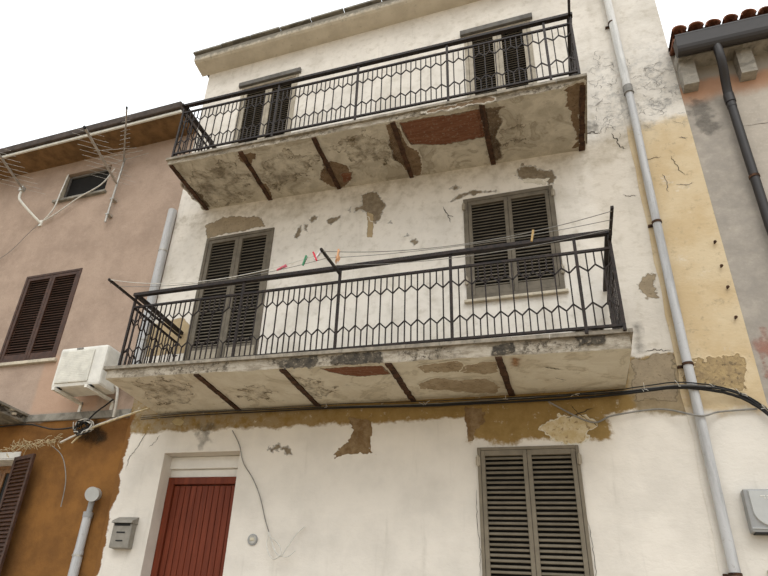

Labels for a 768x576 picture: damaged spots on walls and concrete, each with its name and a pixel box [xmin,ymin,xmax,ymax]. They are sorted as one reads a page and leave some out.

spalling [383,96,507,176]